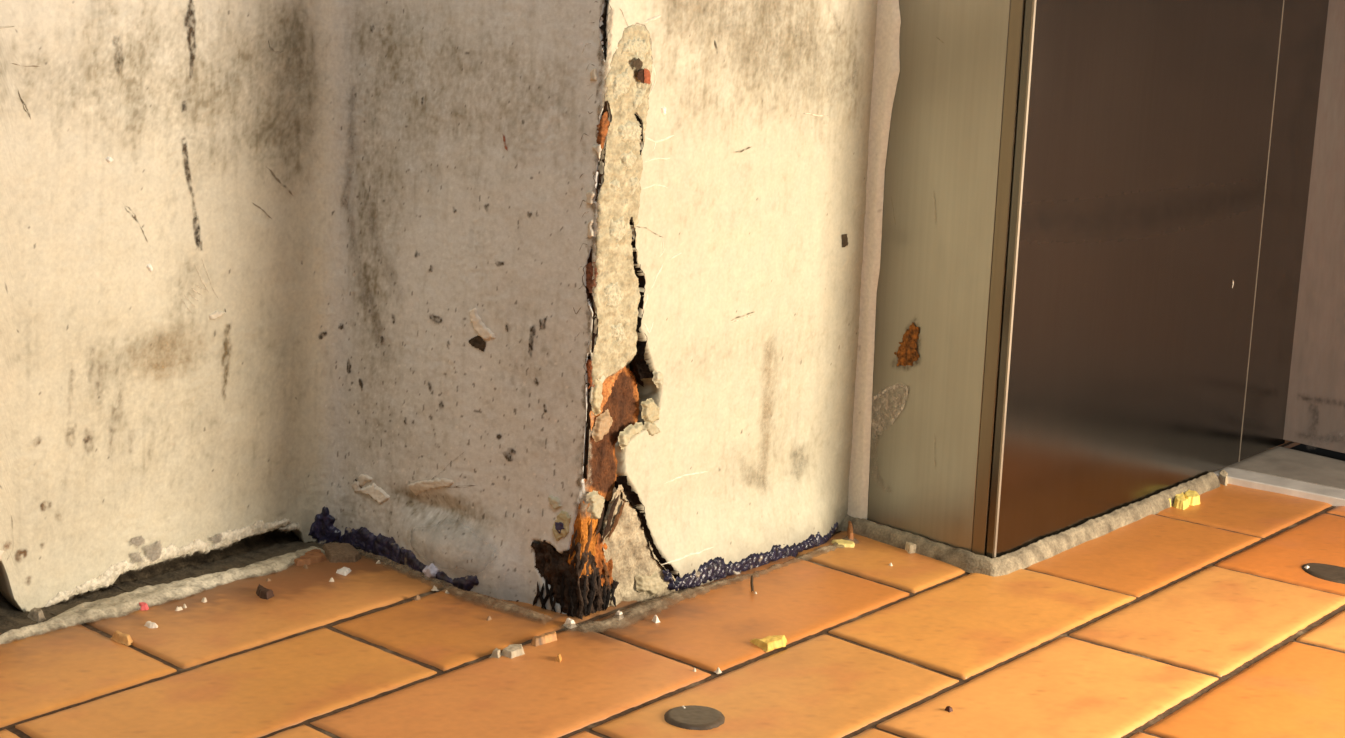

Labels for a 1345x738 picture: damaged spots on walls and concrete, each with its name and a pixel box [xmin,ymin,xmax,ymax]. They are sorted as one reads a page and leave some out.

crack [634,114,644,155]
spalling [531,0,713,620]
crack [629,219,661,387]
corrosion [894,322,919,368]
spalling [0,518,324,635]
crack [615,476,680,584]